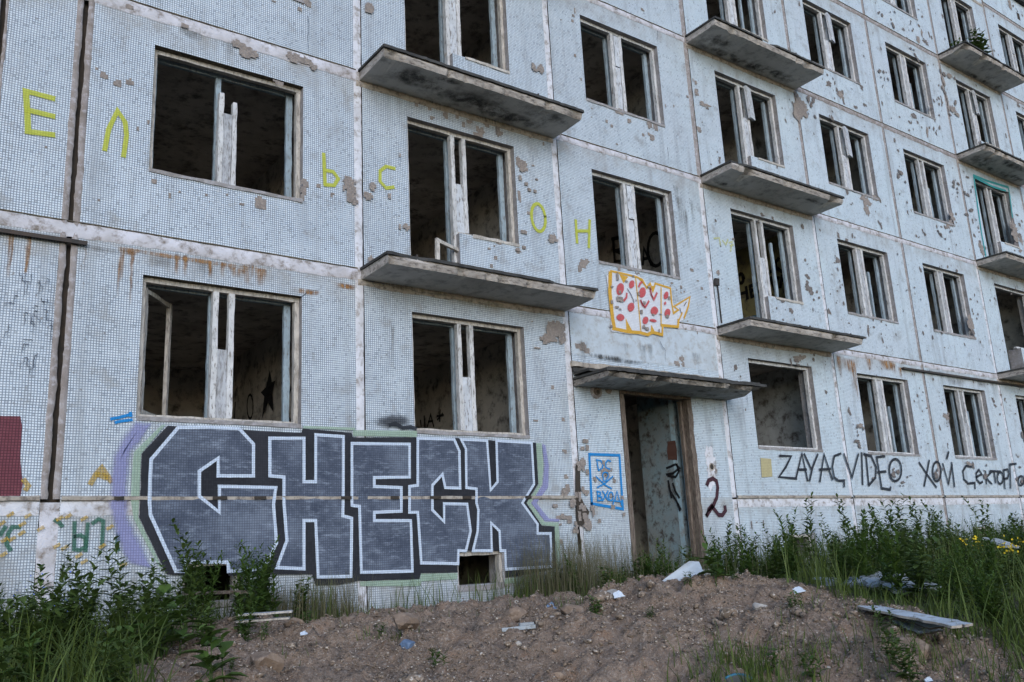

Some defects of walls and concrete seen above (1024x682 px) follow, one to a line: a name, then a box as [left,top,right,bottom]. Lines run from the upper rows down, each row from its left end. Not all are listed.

peeling [233,39,259,59]
peeling [286,51,317,71]
peeling [782,74,867,123]
peeling [239,195,266,210]
peeling [300,175,391,205]
peeling [516,156,538,215]
corrosion [151,252,266,278]
peeling [534,320,590,354]
spalling [553,439,625,533]